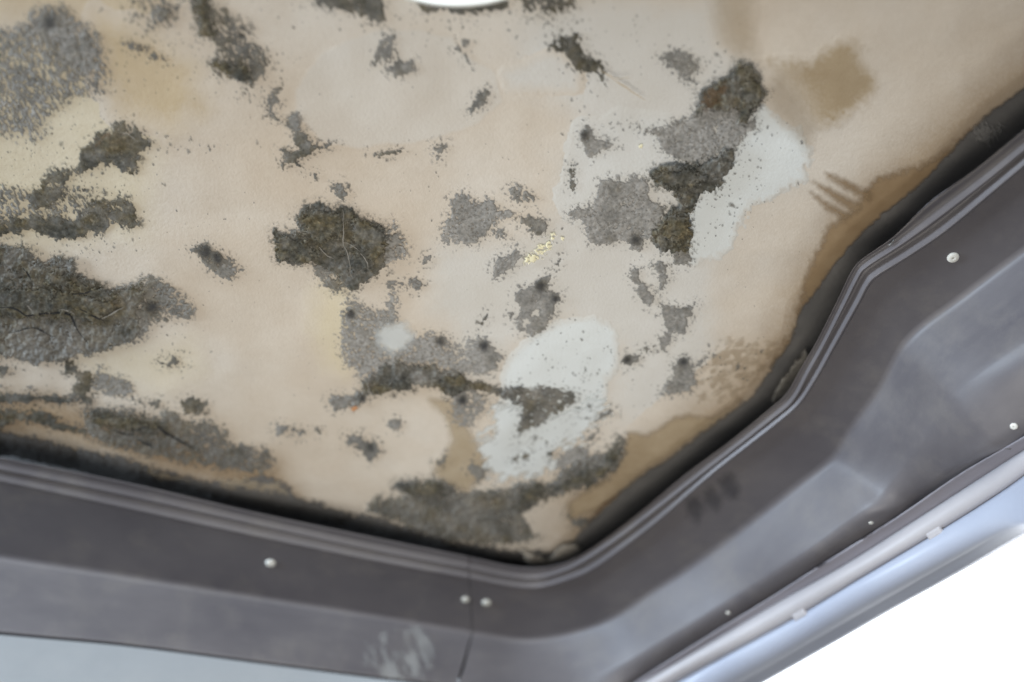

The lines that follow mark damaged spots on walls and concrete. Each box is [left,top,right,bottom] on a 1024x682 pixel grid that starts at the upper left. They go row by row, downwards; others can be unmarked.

damp [0,0,283,267]
damp [0,274,325,503]
damp [384,220,412,264]
damp [431,184,548,280]
damp [505,7,1024,553]